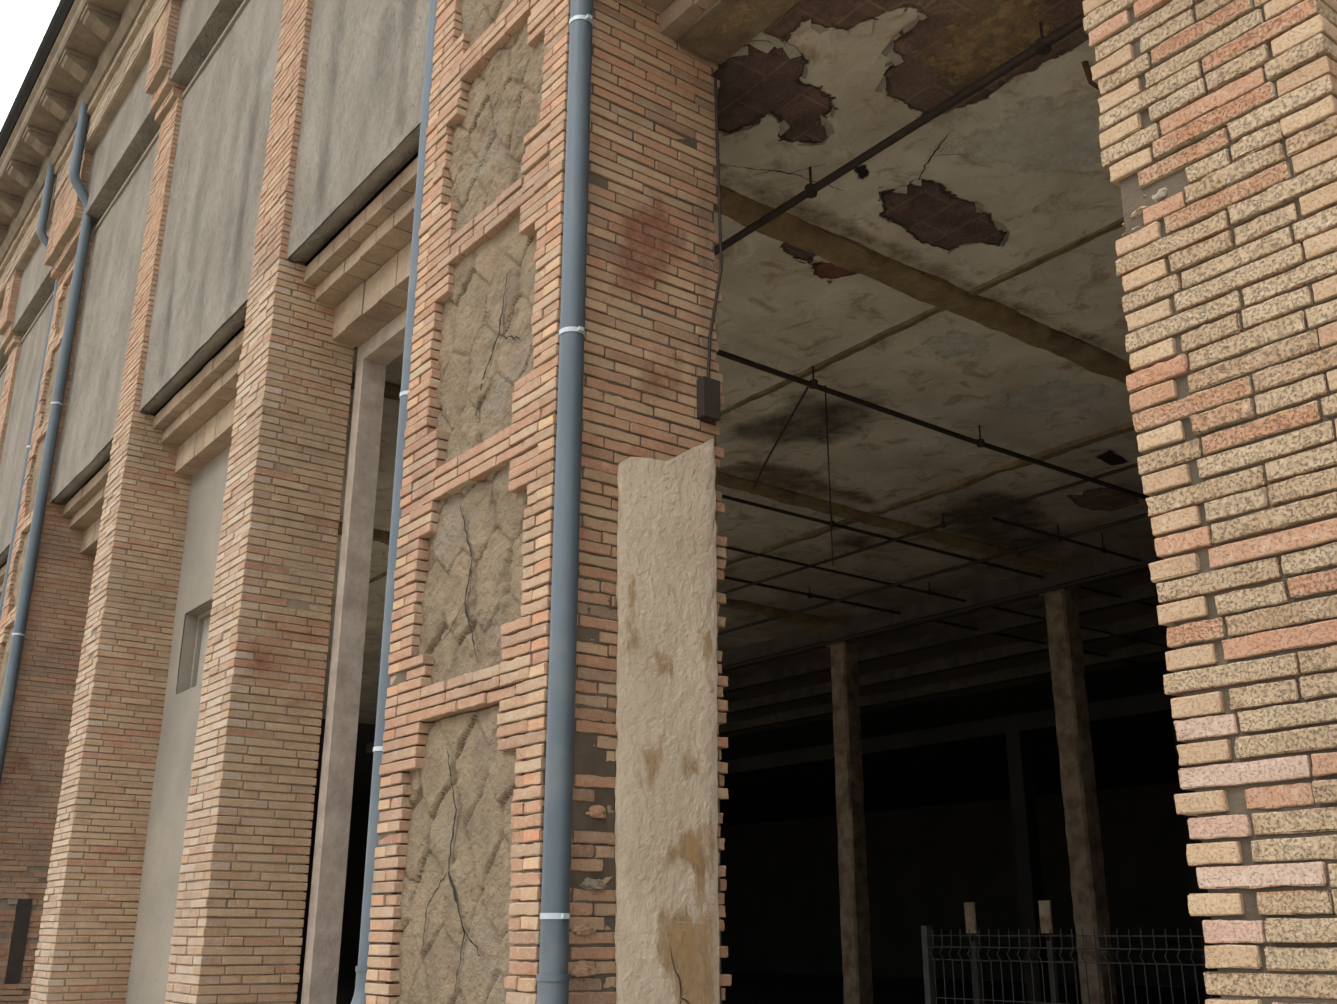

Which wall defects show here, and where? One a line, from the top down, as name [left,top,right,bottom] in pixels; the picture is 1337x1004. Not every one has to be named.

peeling [713,0,1094,146]
peeling [878,179,1009,254]
peeling [780,243,858,284]
damp [738,401,868,443]
damp [657,822,713,1004]